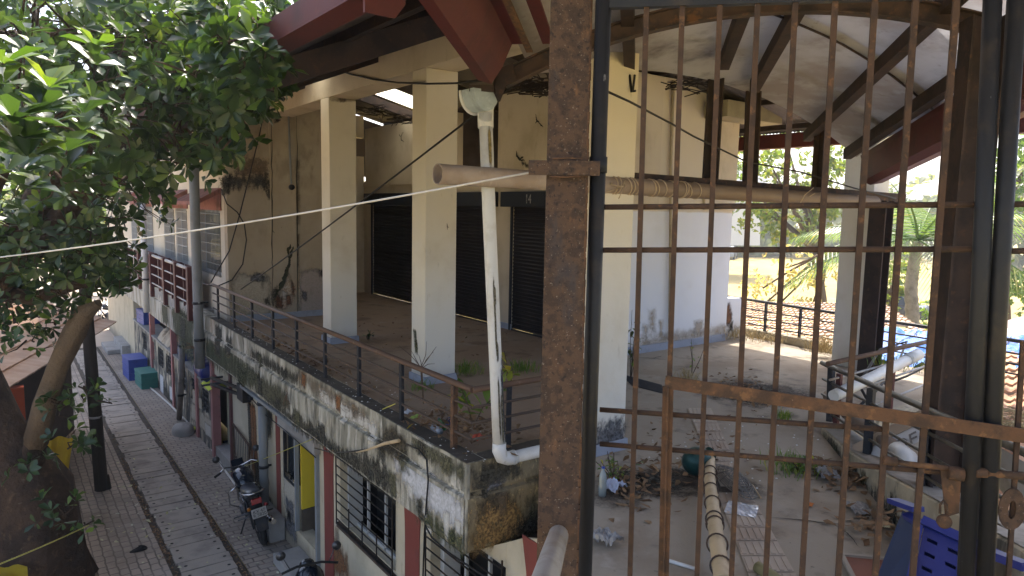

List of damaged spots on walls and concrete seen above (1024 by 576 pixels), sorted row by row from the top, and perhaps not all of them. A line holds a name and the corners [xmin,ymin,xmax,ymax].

leakage [219,158,270,199]
leakage [214,325,232,356]
leakage [239,347,538,553]
leakage [493,280,505,442]
corrosion [576,176,588,576]